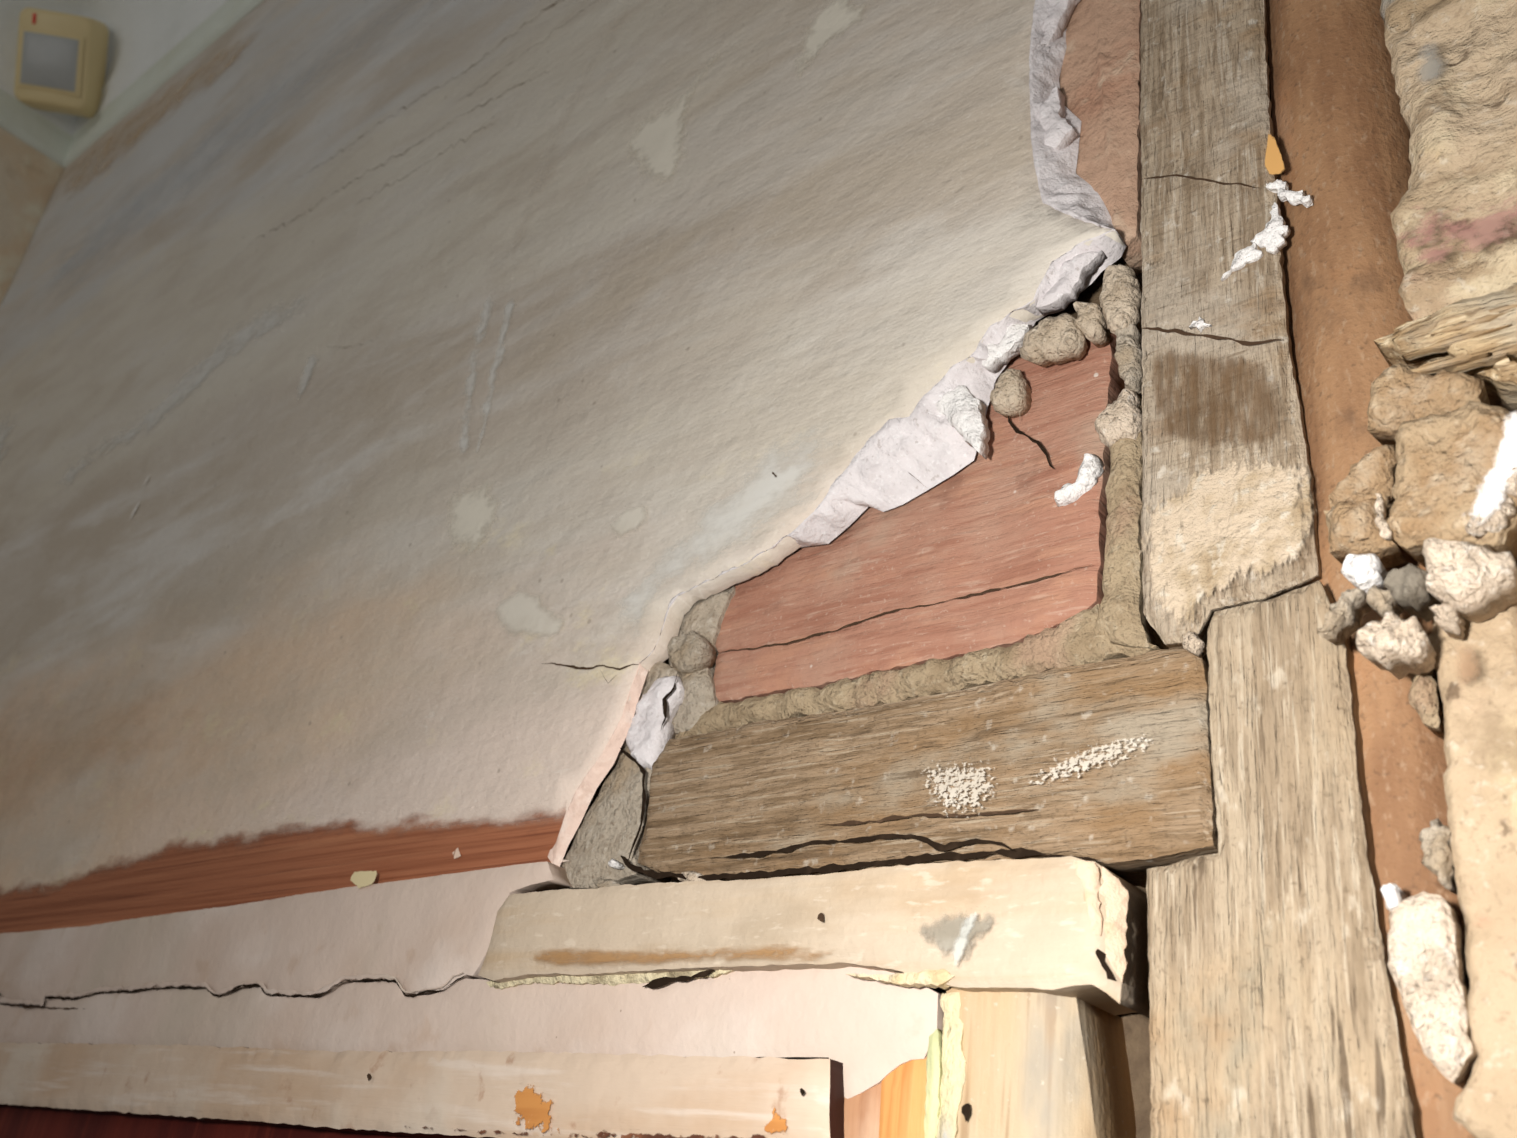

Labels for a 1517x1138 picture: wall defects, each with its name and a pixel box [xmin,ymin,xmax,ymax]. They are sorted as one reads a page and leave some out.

crack [245,0,596,250]
flaking render [0,0,1126,934]
crack [541,663,639,683]
crack [661,676,677,729]
crack [620,748,1100,881]
peeling [953,913,976,965]
peeling [1073,860,1130,984]
crack [0,972,464,1010]
peeling [514,1085,559,1133]